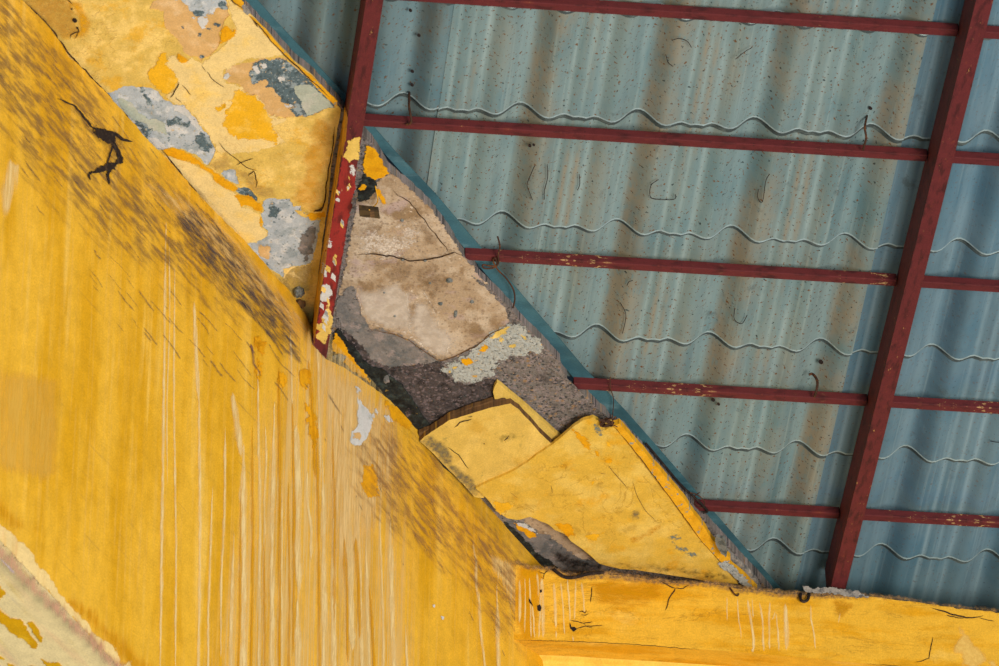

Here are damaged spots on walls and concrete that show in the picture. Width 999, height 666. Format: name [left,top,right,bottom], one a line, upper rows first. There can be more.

crack [23,0,142,184]
peeling [4,161,18,211]
spalling [24,0,612,559]
water stain [145,260,181,666]
water stain [193,304,408,666]
mould [426,437,476,491]
peeling [0,525,131,666]
water stain [473,547,504,666]